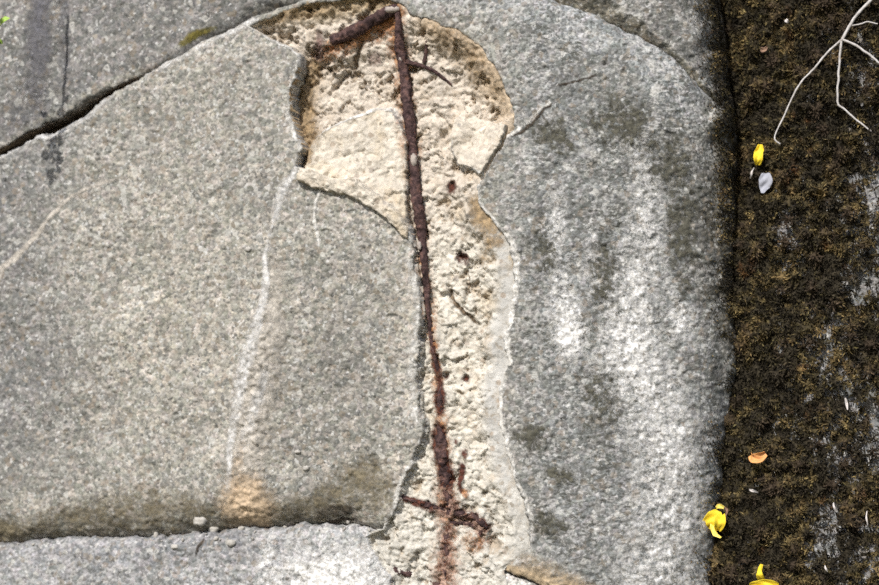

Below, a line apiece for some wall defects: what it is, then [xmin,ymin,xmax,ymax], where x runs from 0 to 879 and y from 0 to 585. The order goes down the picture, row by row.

rust [315,4,405,107]
crack [0,76,142,156]
spalling [246,0,534,585]
rust [400,289,491,585]
crack [324,506,357,523]